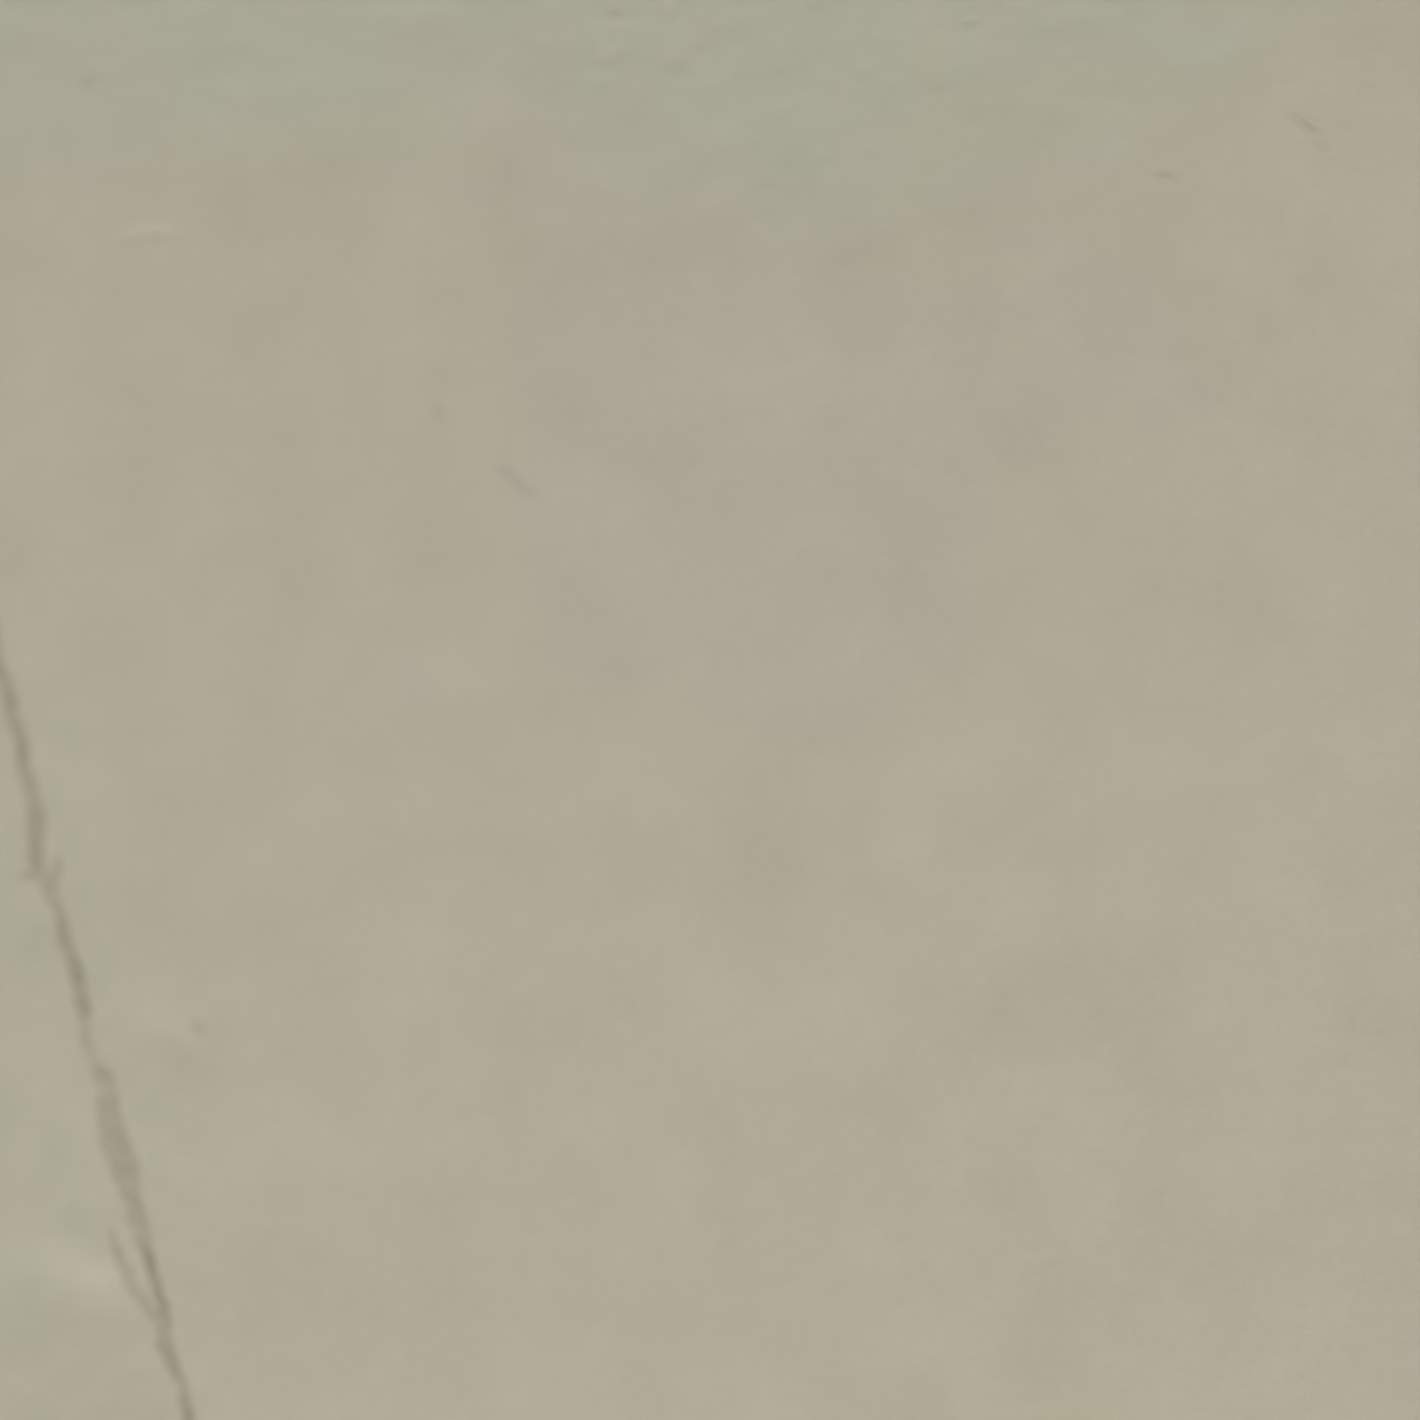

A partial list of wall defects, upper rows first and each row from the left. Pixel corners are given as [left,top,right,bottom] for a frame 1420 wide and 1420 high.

crack [0,622,197,1420]